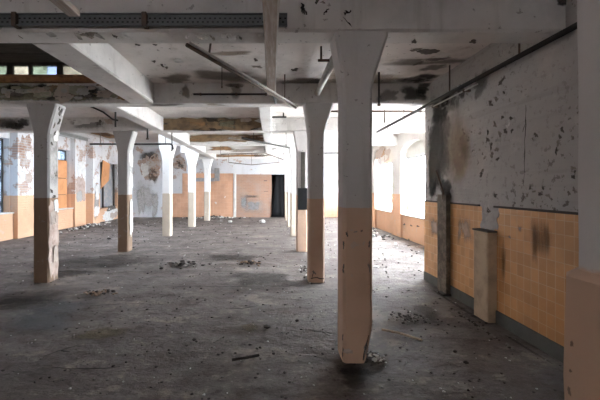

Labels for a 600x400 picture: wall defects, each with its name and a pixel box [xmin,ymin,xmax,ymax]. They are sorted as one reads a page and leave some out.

water stain [380,58,462,101]
peeling [0,83,125,184]
water stain [429,88,464,199]
peeling [486,116,513,161]
peeling [129,150,161,190]